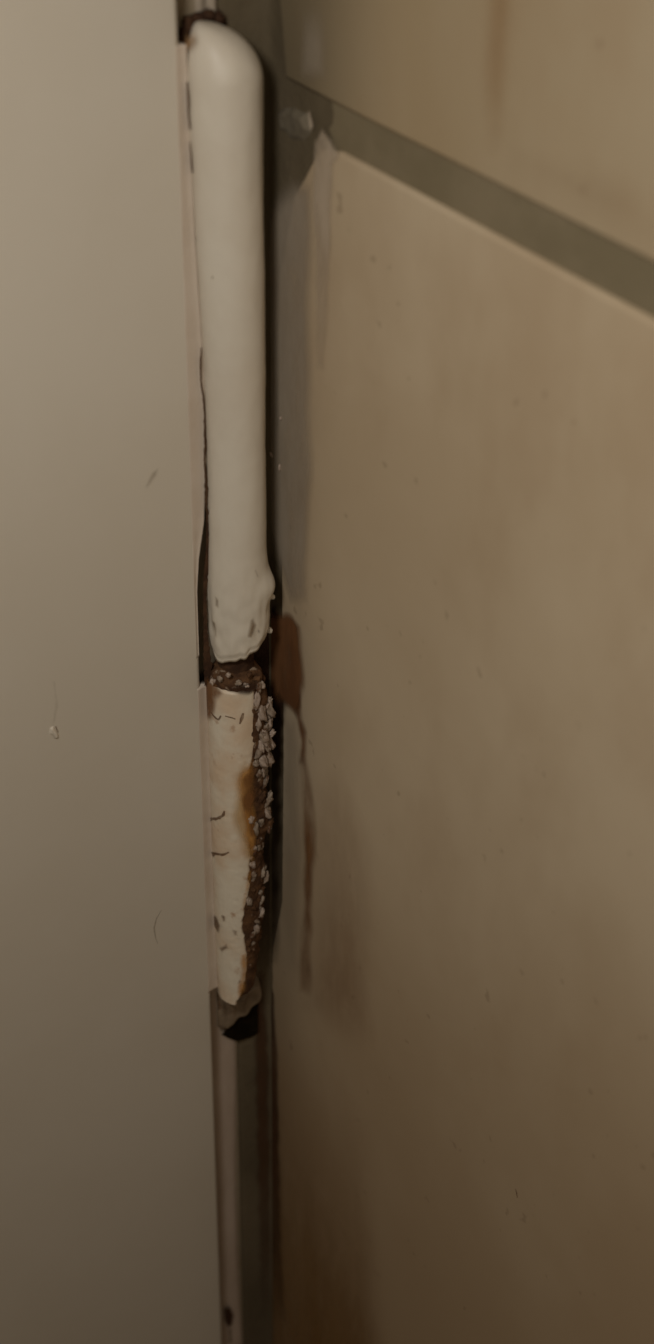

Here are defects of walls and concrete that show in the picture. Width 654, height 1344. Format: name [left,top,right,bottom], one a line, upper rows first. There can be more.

peeling [210,672,276,970]
rust [206,608,305,849]
rust [305,821,313,924]